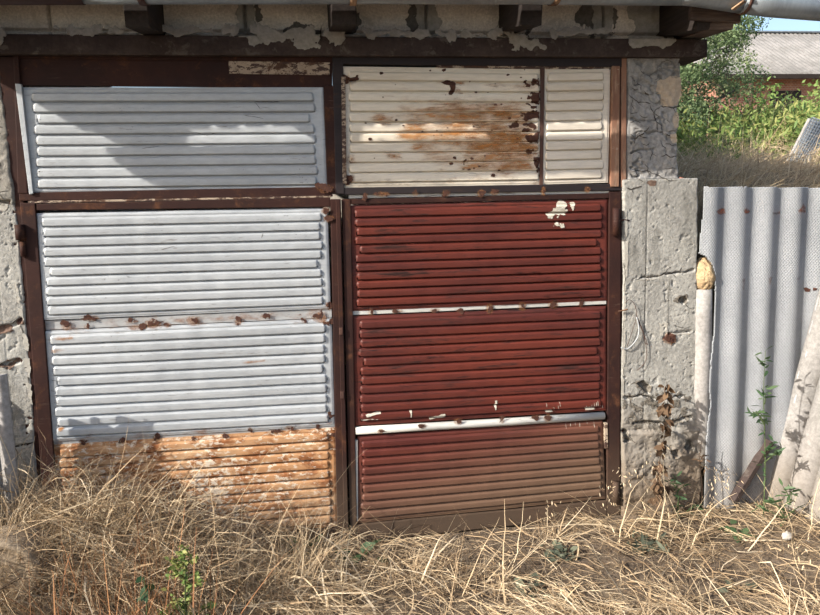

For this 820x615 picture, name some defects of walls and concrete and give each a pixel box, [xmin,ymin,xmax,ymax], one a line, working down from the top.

corrosion [429,65,611,78]
peeling [656,76,682,143]
corrosion [365,94,538,172]
crack [628,60,678,217]
peeling [546,200,575,228]
corrosion [128,318,170,331]
corrosion [300,302,333,326]
spalling [0,282,33,404]
spalling [671,439,696,460]